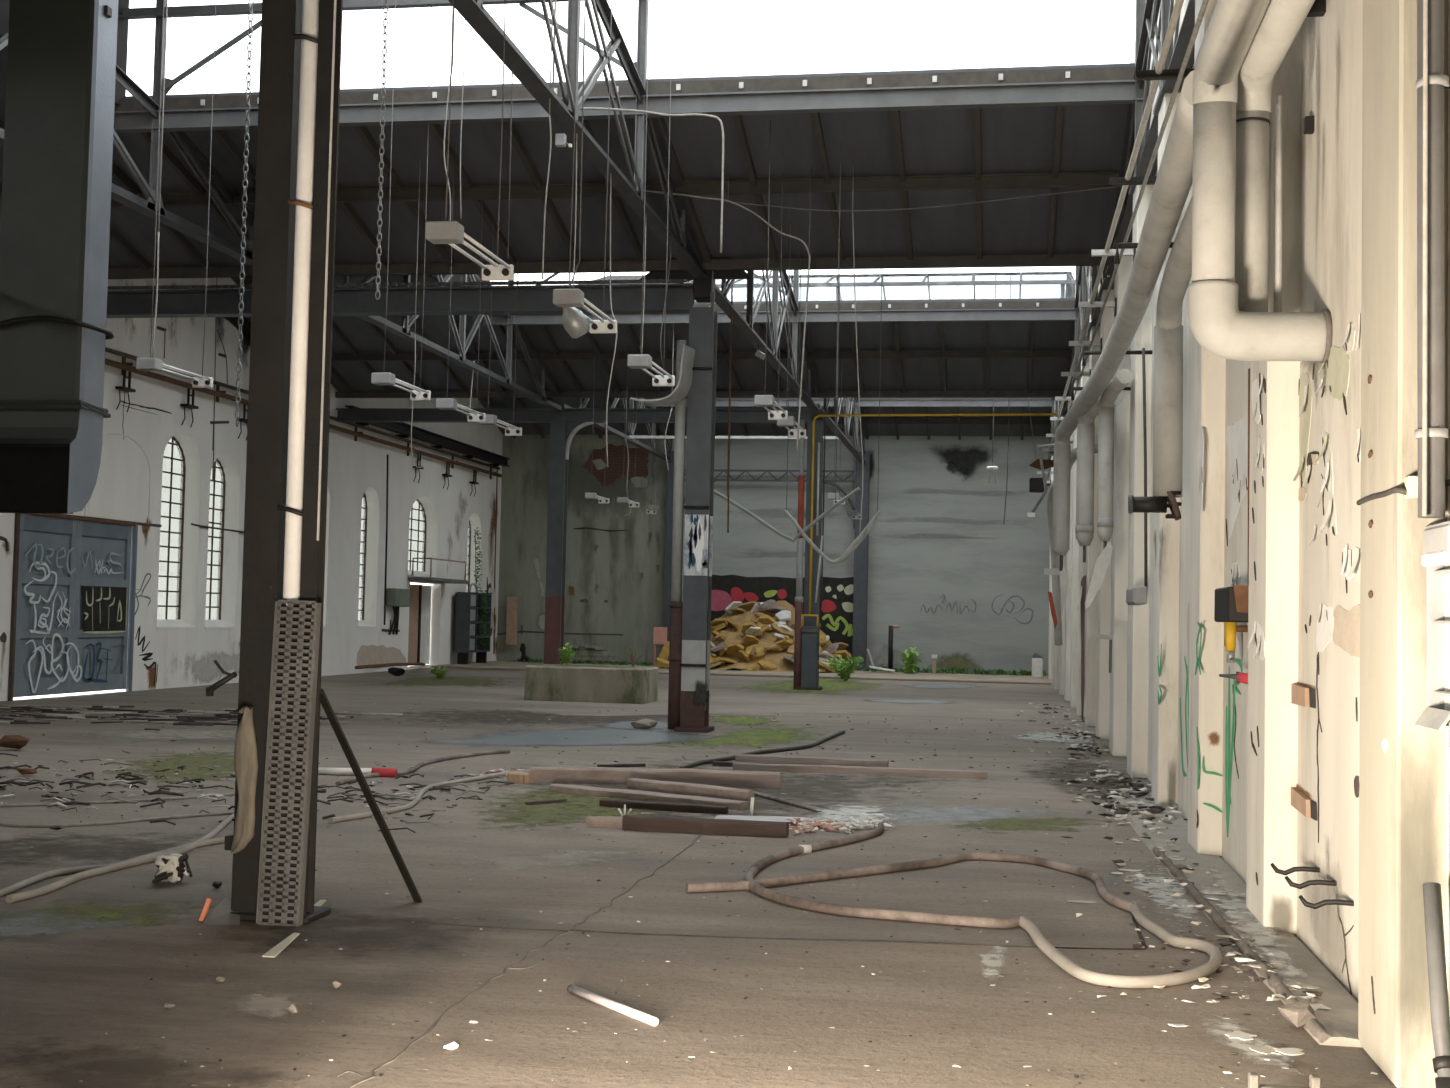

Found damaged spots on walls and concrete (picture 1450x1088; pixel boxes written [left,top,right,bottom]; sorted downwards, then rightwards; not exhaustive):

flaking render [583,444,649,488]
peeling [1293,313,1373,675]
damp [408,709,668,724]
damp [867,806,1034,823]
crack [338,834,1148,1088]